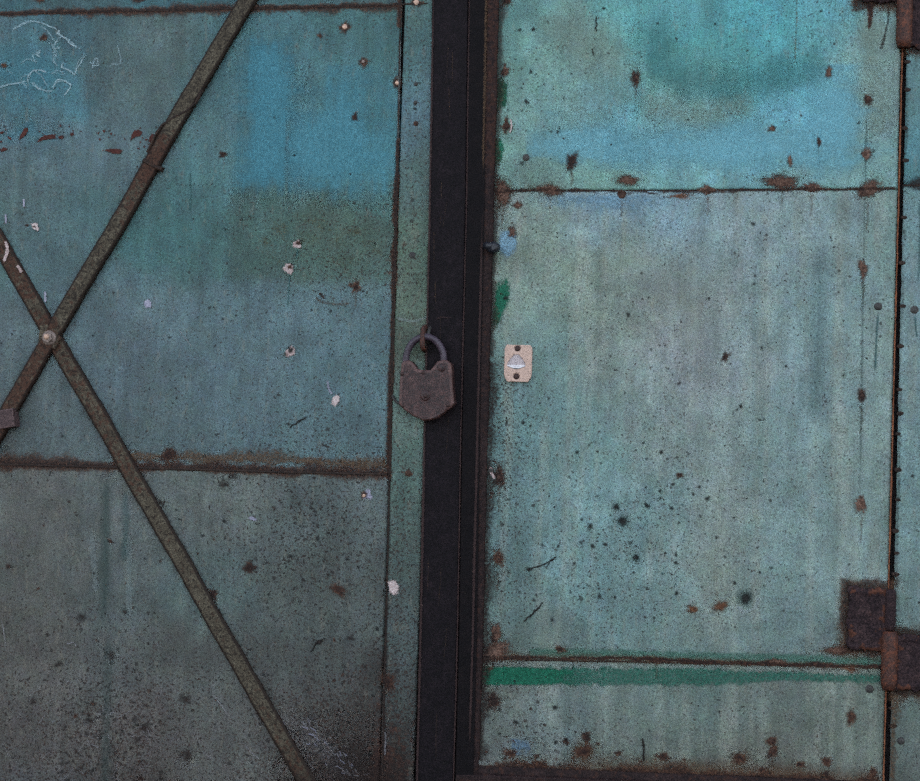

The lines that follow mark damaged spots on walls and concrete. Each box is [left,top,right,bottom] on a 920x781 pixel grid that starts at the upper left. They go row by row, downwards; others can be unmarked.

rust [853,0,897,48]
rust [482,0,595,241]
rust [612,155,895,198]
rust [129,172,399,498]
rust [453,30,469,781]
rust [0,454,118,472]
rust [469,241,897,736]
peeling [388,580,399,595]
rust [481,732,879,781]
rust [890,689,920,781]